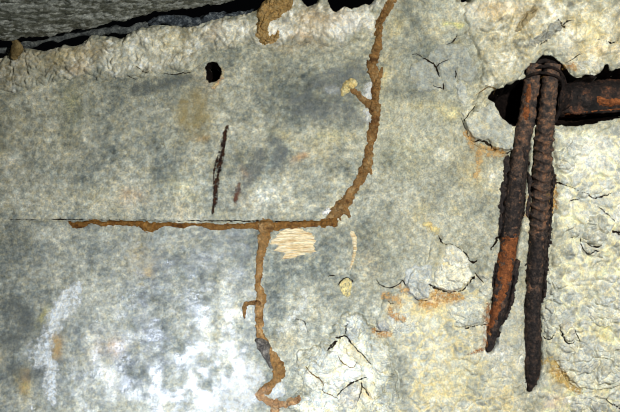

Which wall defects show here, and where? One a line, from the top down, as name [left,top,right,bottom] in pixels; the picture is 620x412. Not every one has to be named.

spalling [0,0,387,93]
crack [412,54,457,90]
rust [212,125,228,214]
crack [178,217,300,225]
spalling [288,0,620,412]
crack [415,235,484,301]
crack [305,324,371,400]